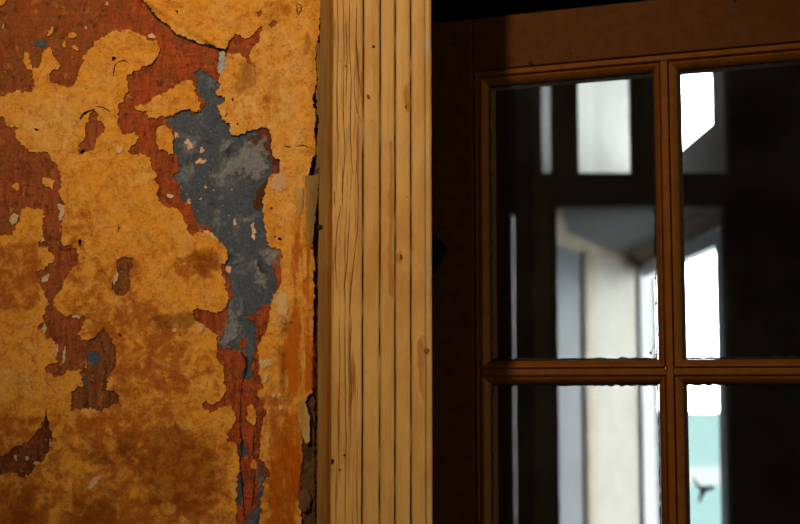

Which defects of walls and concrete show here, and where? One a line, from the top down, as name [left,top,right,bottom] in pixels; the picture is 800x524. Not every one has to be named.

peeling [0,0,319,524]
rust [292,228,310,296]
rust [282,299,313,393]
rust [269,413,300,524]